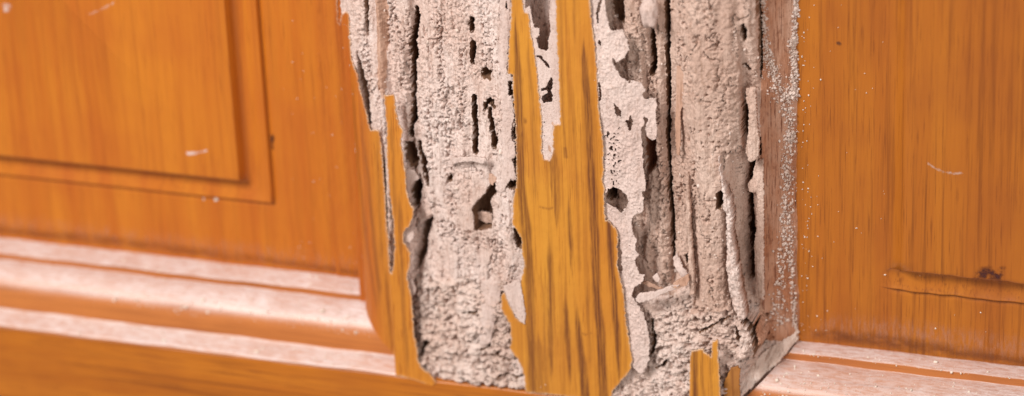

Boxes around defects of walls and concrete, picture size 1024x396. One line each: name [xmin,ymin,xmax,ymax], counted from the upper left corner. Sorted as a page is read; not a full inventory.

peeling [406,167,419,192]
peeling [448,156,497,185]
peeling [404,212,419,243]
peeling [478,210,493,224]
peeling [673,253,688,277]